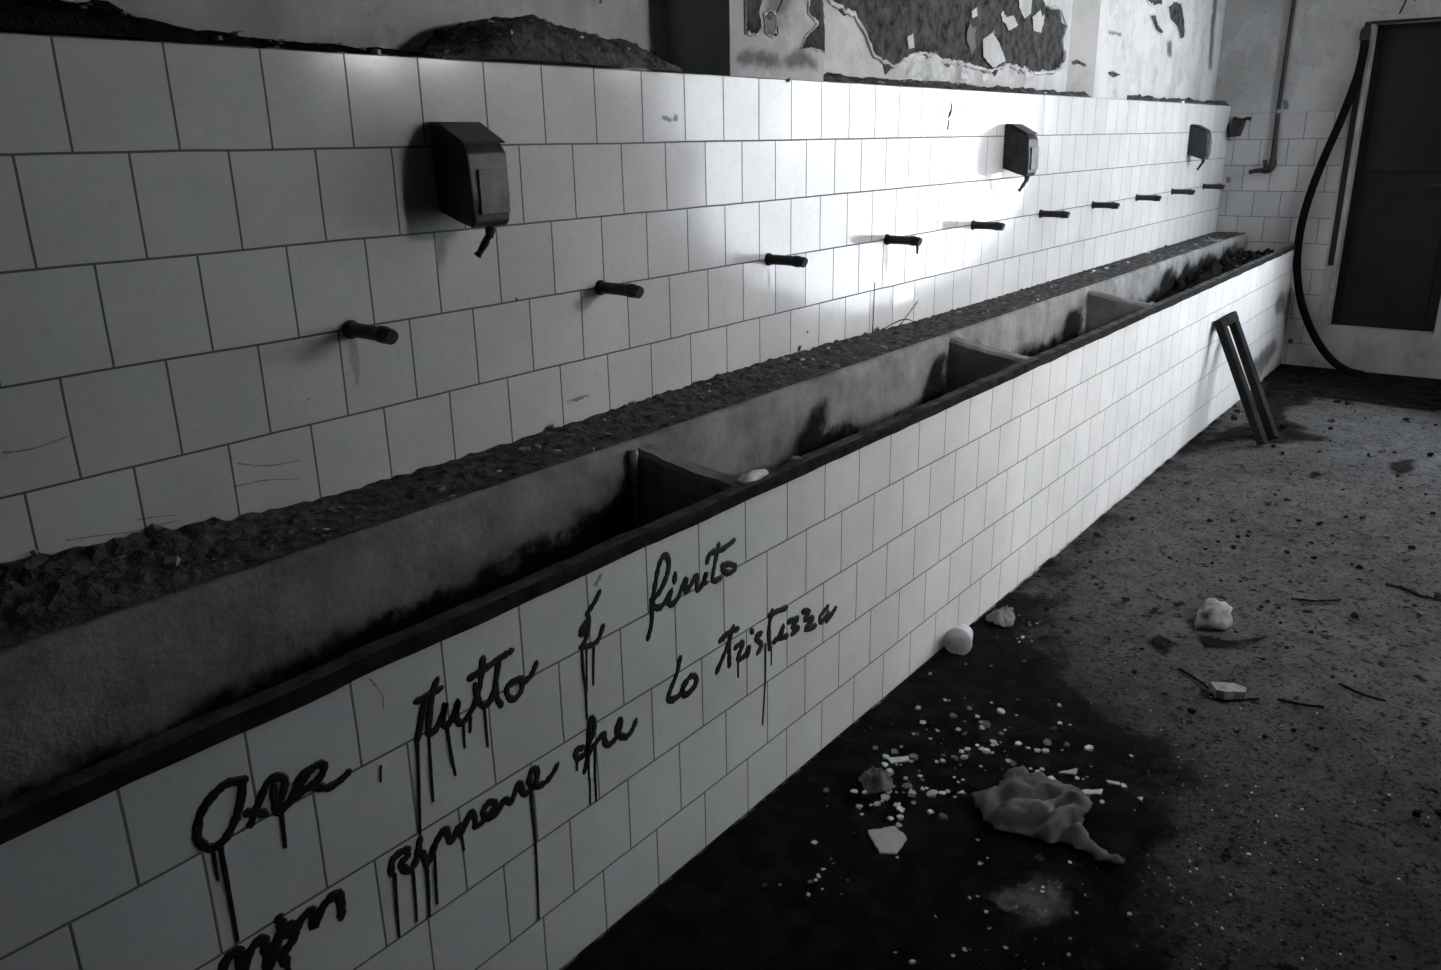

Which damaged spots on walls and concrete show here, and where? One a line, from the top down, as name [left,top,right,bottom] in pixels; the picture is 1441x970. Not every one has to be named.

peeling [744,0,778,38]
spalling [799,0,1068,76]
spalling [1145,0,1185,41]